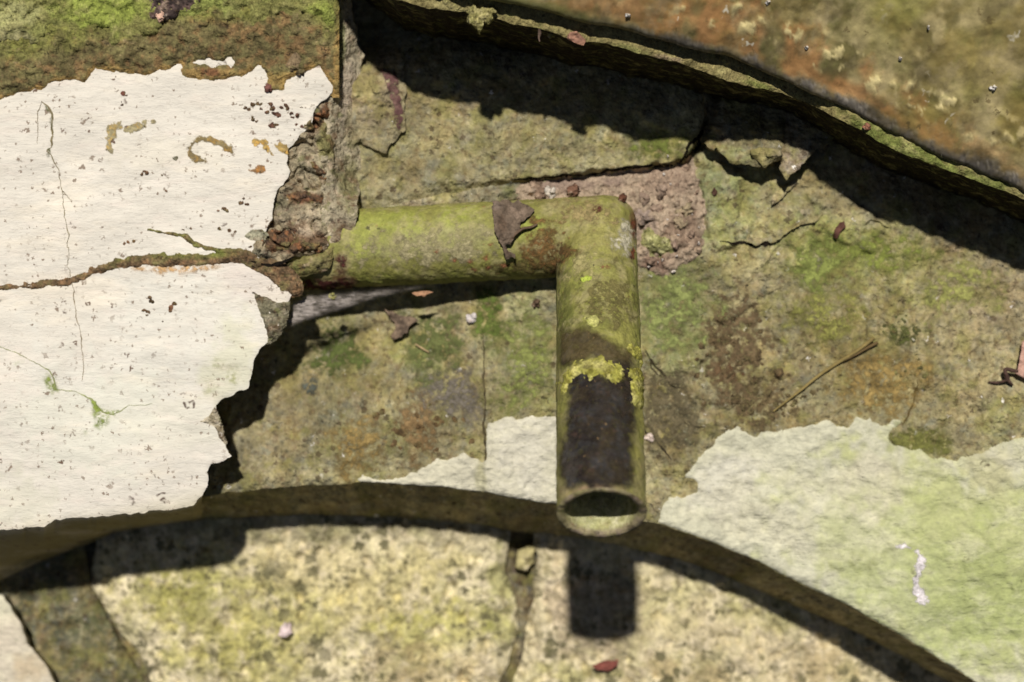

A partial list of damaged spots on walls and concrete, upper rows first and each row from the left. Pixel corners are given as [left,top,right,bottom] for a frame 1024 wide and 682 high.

peeling [0,0,407,278]
corrosion [243,101,304,131]
crack [512,130,704,181]
spalling [700,93,834,246]
crack [0,101,303,427]
corrosion [303,256,354,291]
corrosion [520,216,577,273]
crack [721,230,792,247]
spalling [252,292,290,344]
spalling [200,407,227,445]
leakage [559,328,699,488]
peeling [358,415,557,504]